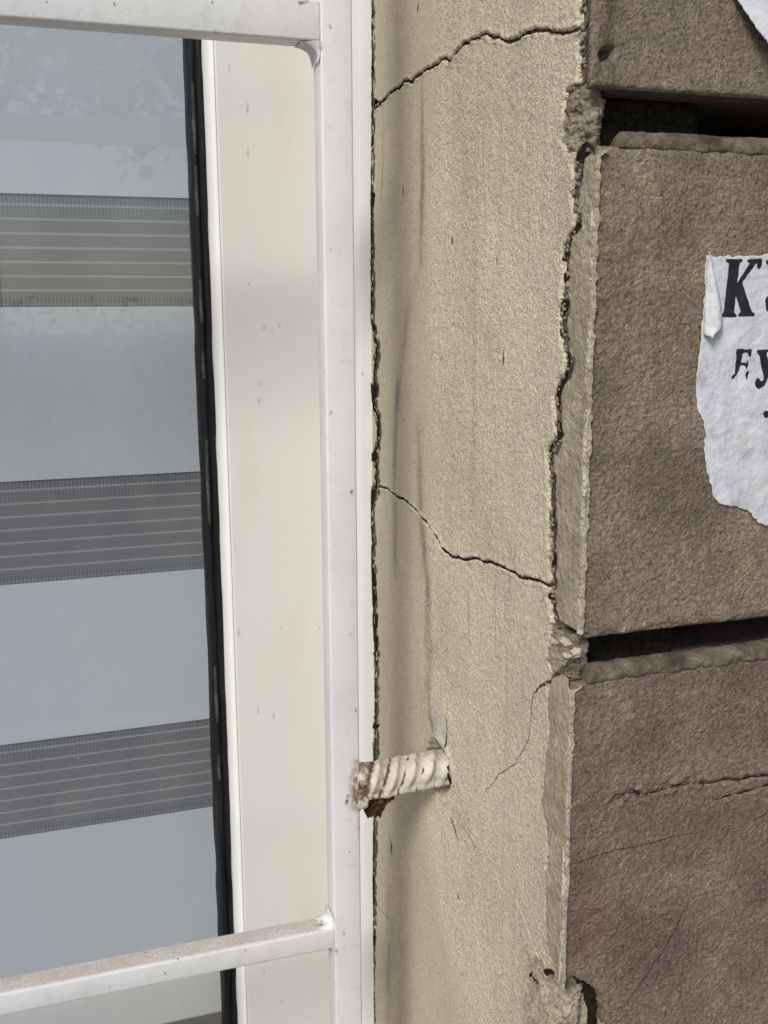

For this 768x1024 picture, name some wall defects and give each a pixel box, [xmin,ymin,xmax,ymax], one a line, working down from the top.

spalling [558,83,606,153]
crack [370,0,589,761]
spalling [547,624,589,678]
crack [486,659,581,790]
corrosion [346,779,395,818]
crack [615,774,768,816]
crack [582,835,674,861]
crack [371,816,379,1023]
spalling [522,943,598,1024]